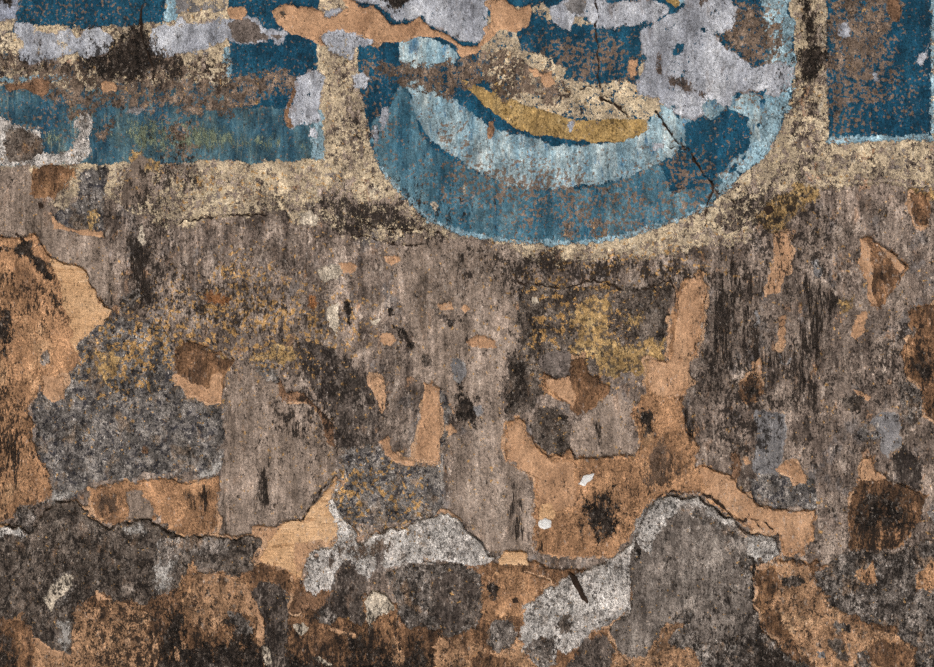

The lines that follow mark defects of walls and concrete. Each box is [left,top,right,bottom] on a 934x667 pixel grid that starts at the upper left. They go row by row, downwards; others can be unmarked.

damp [0,20,300,122]
peeling [272,0,532,57]
crack [575,0,629,118]
crack [654,110,735,226]
spalling [838,235,909,341]
flaking render [0,233,358,666]
spalling [465,265,818,667]
spalling [838,390,871,414]
spalling [847,454,929,552]
spalling [897,300,934,426]
flaking render [364,590,405,667]
flaking render [817,621,914,667]